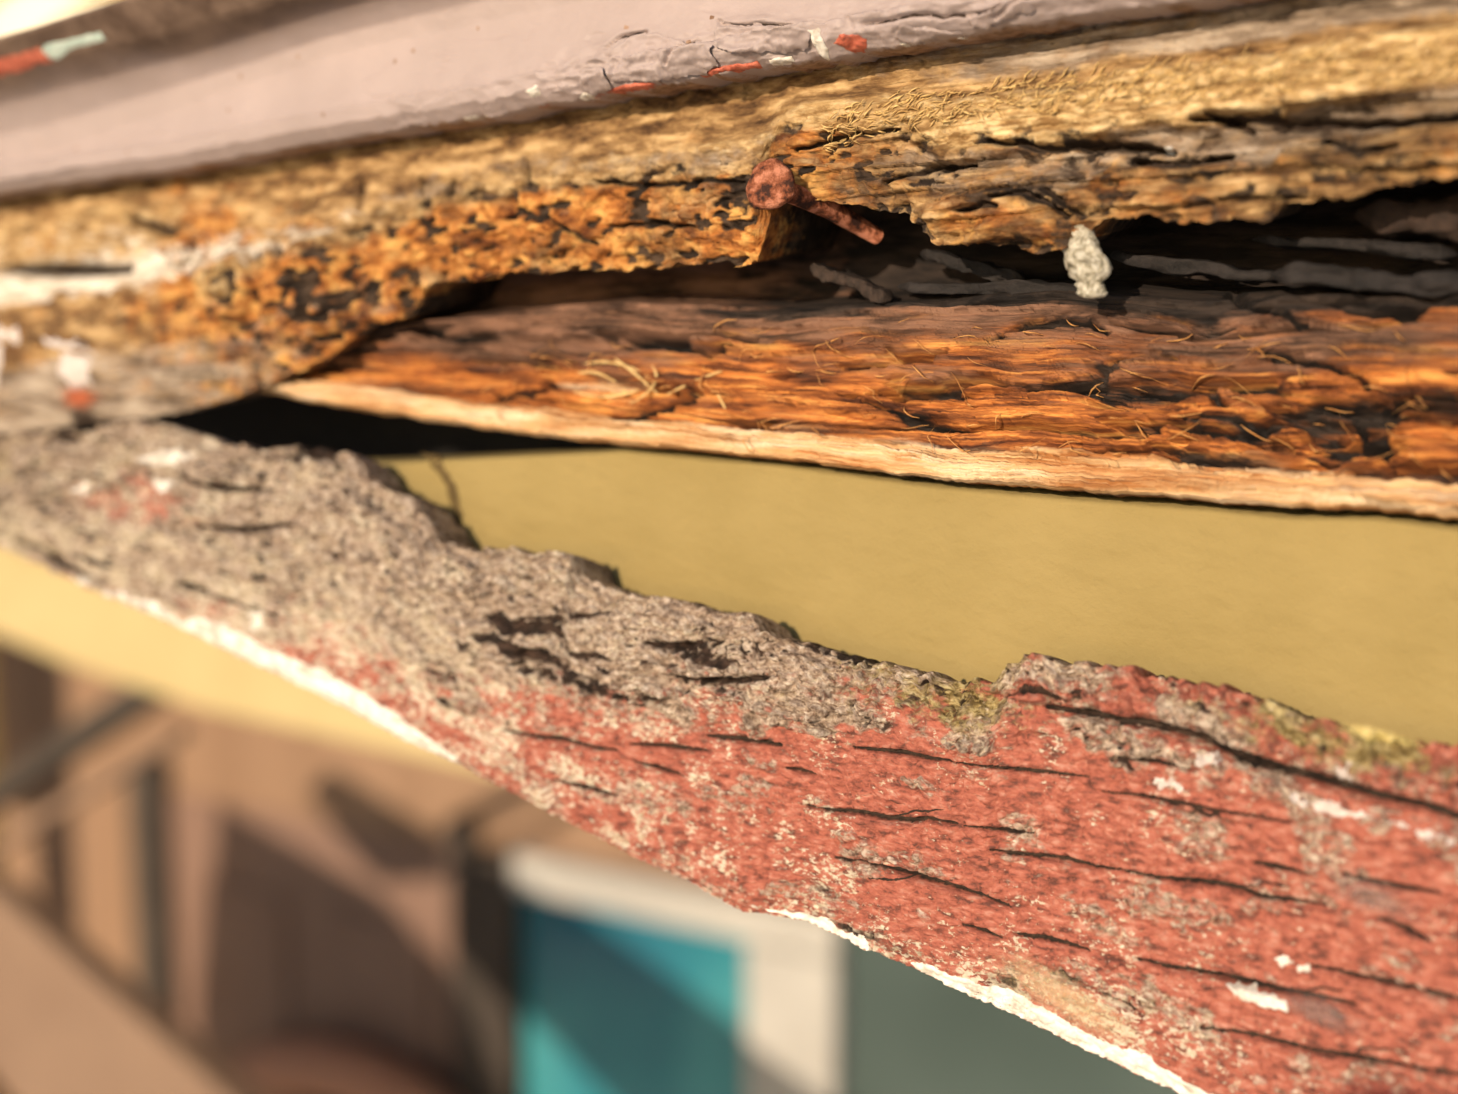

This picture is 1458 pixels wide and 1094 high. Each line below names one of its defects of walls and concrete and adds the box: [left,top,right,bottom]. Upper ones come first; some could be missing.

peeling [525,85,551,108]
peeling [71,480,92,495]
peeling [138,446,198,494]
peeling [73,574,459,763]
crack [676,675,768,683]
crack [853,746,1084,776]
crack [1052,706,1458,814]
crack [823,807,955,823]
crack [837,856,1079,946]
crack [989,849,1327,905]
crack [1139,958,1458,1005]
crack [1202,1026,1458,1074]